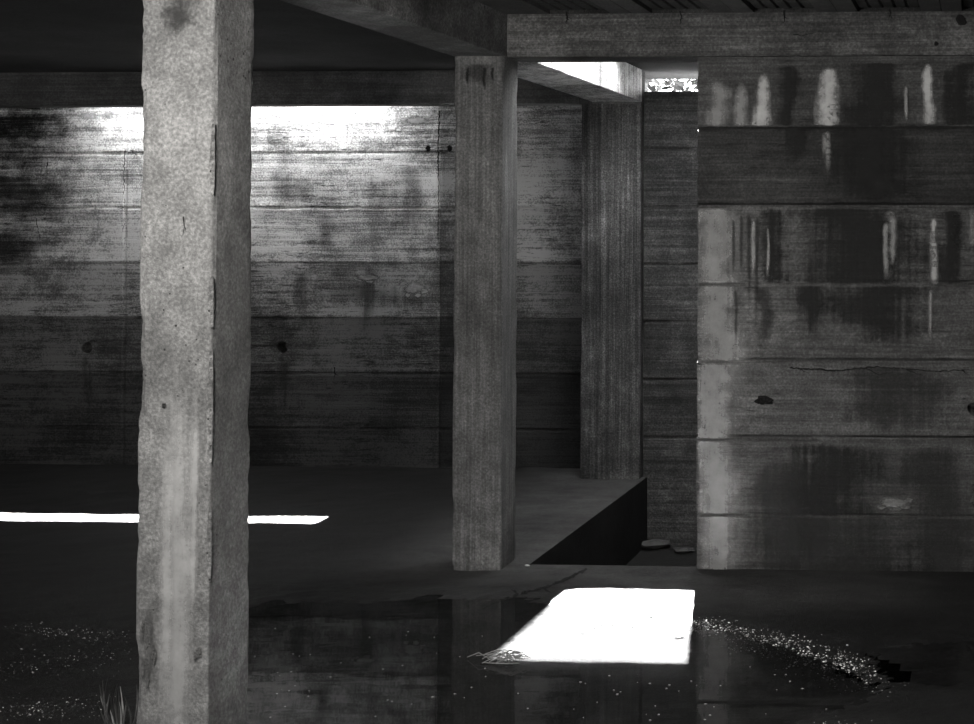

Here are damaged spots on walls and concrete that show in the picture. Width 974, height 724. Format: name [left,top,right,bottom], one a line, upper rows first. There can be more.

leakage [711,66,805,157]
leakage [797,63,961,339]
leakage [698,209,787,569]